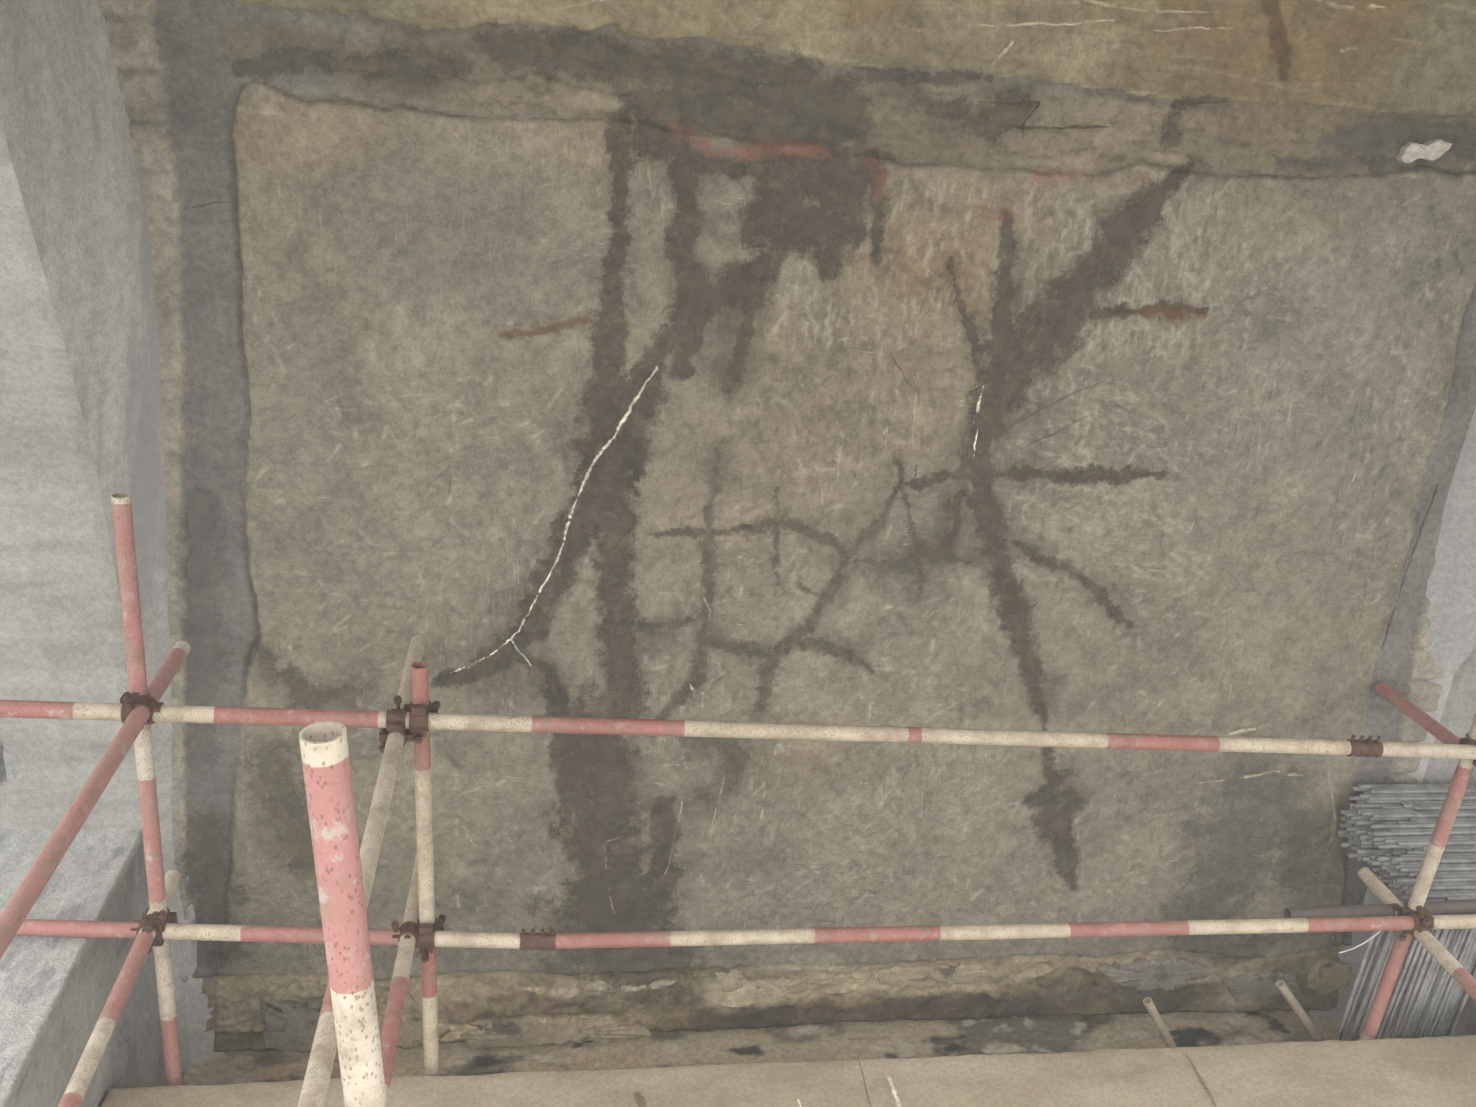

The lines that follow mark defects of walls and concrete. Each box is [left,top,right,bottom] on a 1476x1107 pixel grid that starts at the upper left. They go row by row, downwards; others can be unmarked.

water stain [1160,95,1227,149]
water stain [1279,116,1476,173]
water stain [232,22,1208,1014]
water stain [179,489,229,776]
water stain [179,810,254,968]